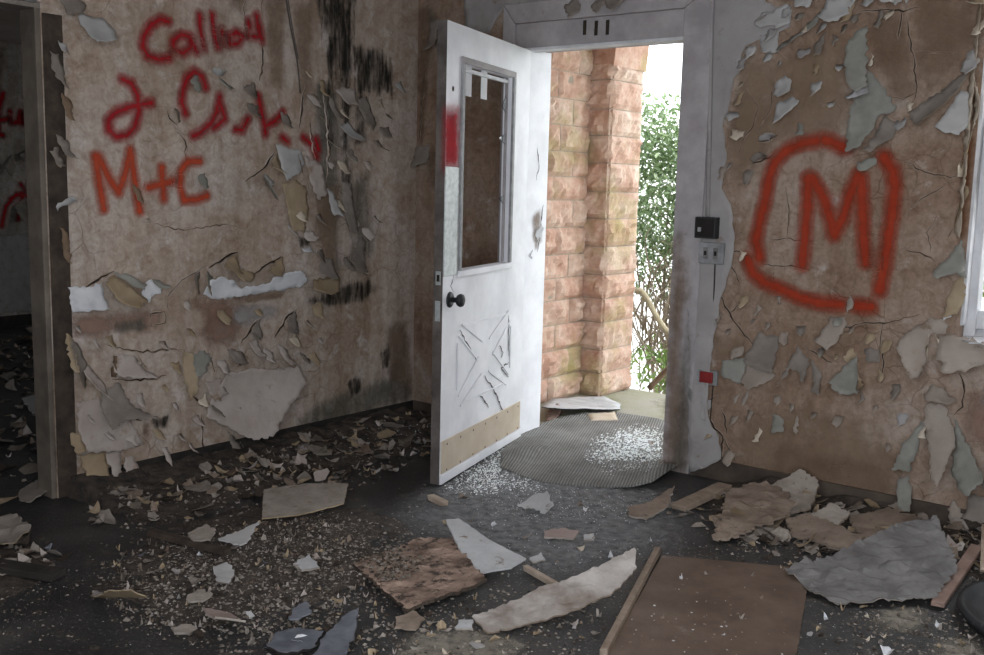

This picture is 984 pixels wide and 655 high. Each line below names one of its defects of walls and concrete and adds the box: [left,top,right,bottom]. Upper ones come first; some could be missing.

peeling [463,0,545,33]
peeling [564,0,623,17]
peeling [50,41,75,121]
peeling [50,134,78,168]
damp [298,0,392,260]
peeling [533,205,544,252]
peeling [687,0,984,472]
peeling [65,71,402,501]
spalling [546,403,562,421]
peeling [885,384,984,564]
spalling [627,486,722,527]
peeling [752,526,789,546]